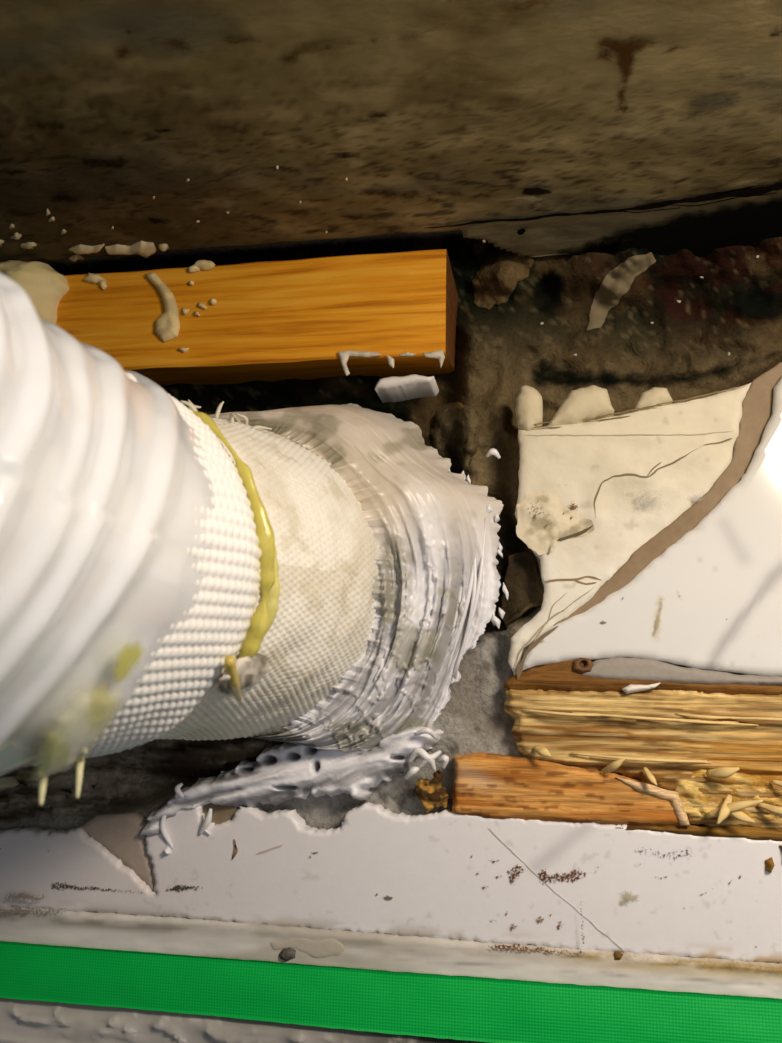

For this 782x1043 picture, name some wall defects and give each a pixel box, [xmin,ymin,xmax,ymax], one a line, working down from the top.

rust [597,38,656,112]
crack [424,182,782,229]
leakage [558,198,782,259]
leakage [535,271,564,314]
leakage [534,358,734,389]
flaking render [491,490,594,629]
spalling [203,803,240,825]
spalling [79,812,155,891]